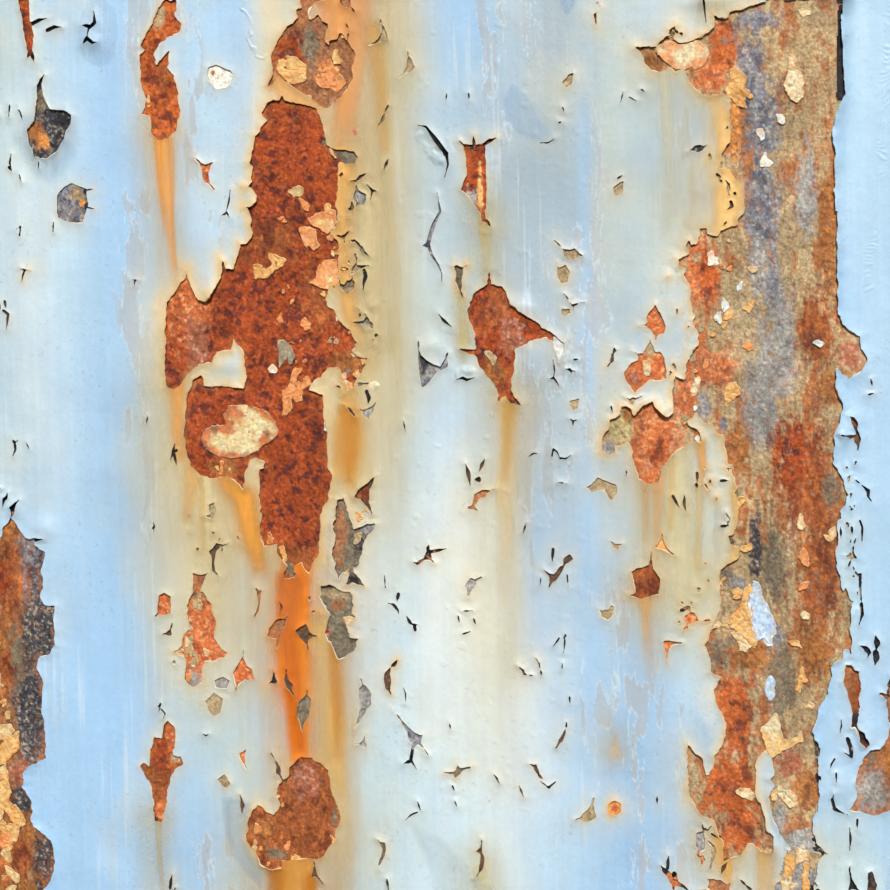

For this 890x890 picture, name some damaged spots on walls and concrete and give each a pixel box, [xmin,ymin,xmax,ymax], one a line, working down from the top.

peeling [27,75,71,158]
corrosion [152,134,175,267]
corrosion [273,76,316,108]
corrosion [709,94,745,236]
crack [836,0,845,100]
peeling [165,0,378,659]
corrosion [164,374,263,602]
corrosion [333,382,365,490]
corrosion [644,441,706,603]
peeling [602,0,890,890]
peeling [0,512,55,890]
corrosion [711,833,733,884]